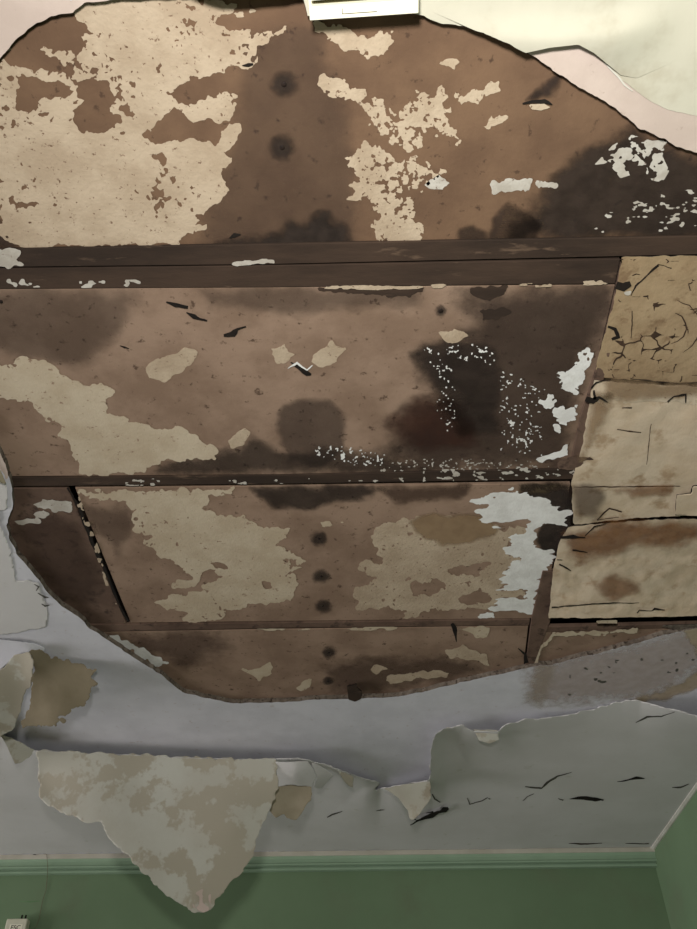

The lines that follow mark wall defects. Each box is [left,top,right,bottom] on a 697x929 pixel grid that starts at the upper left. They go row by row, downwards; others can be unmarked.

flaking render [0,0,108,58]
peeling [359,85,461,193]
leakage [460,130,697,239]
flaking render [529,45,697,182]
peeling [626,190,697,232]
leakage [125,289,609,554]
peeling [538,394,557,409]
crack [557,259,697,571]
leakage [533,628,697,702]
flaking render [0,598,697,913]
crack [411,794,490,825]
crack [523,772,603,801]